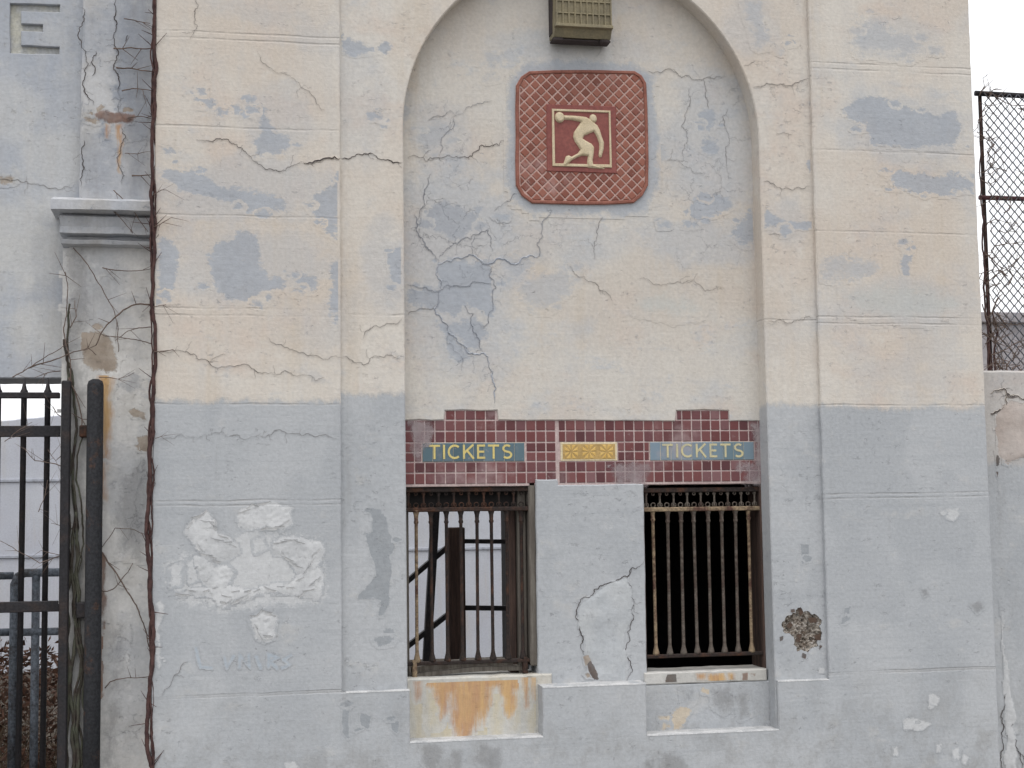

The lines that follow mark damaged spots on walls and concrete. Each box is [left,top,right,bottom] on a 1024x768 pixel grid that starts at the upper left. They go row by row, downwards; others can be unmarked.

crack [77,0,128,183]
crack [649,68,738,173]
crack [160,100,551,403]
crack [991,385,1024,415]
peeling [172,500,326,645]
crack [574,566,640,680]
spalling [779,607,822,659]
corrosion [410,677,536,736]